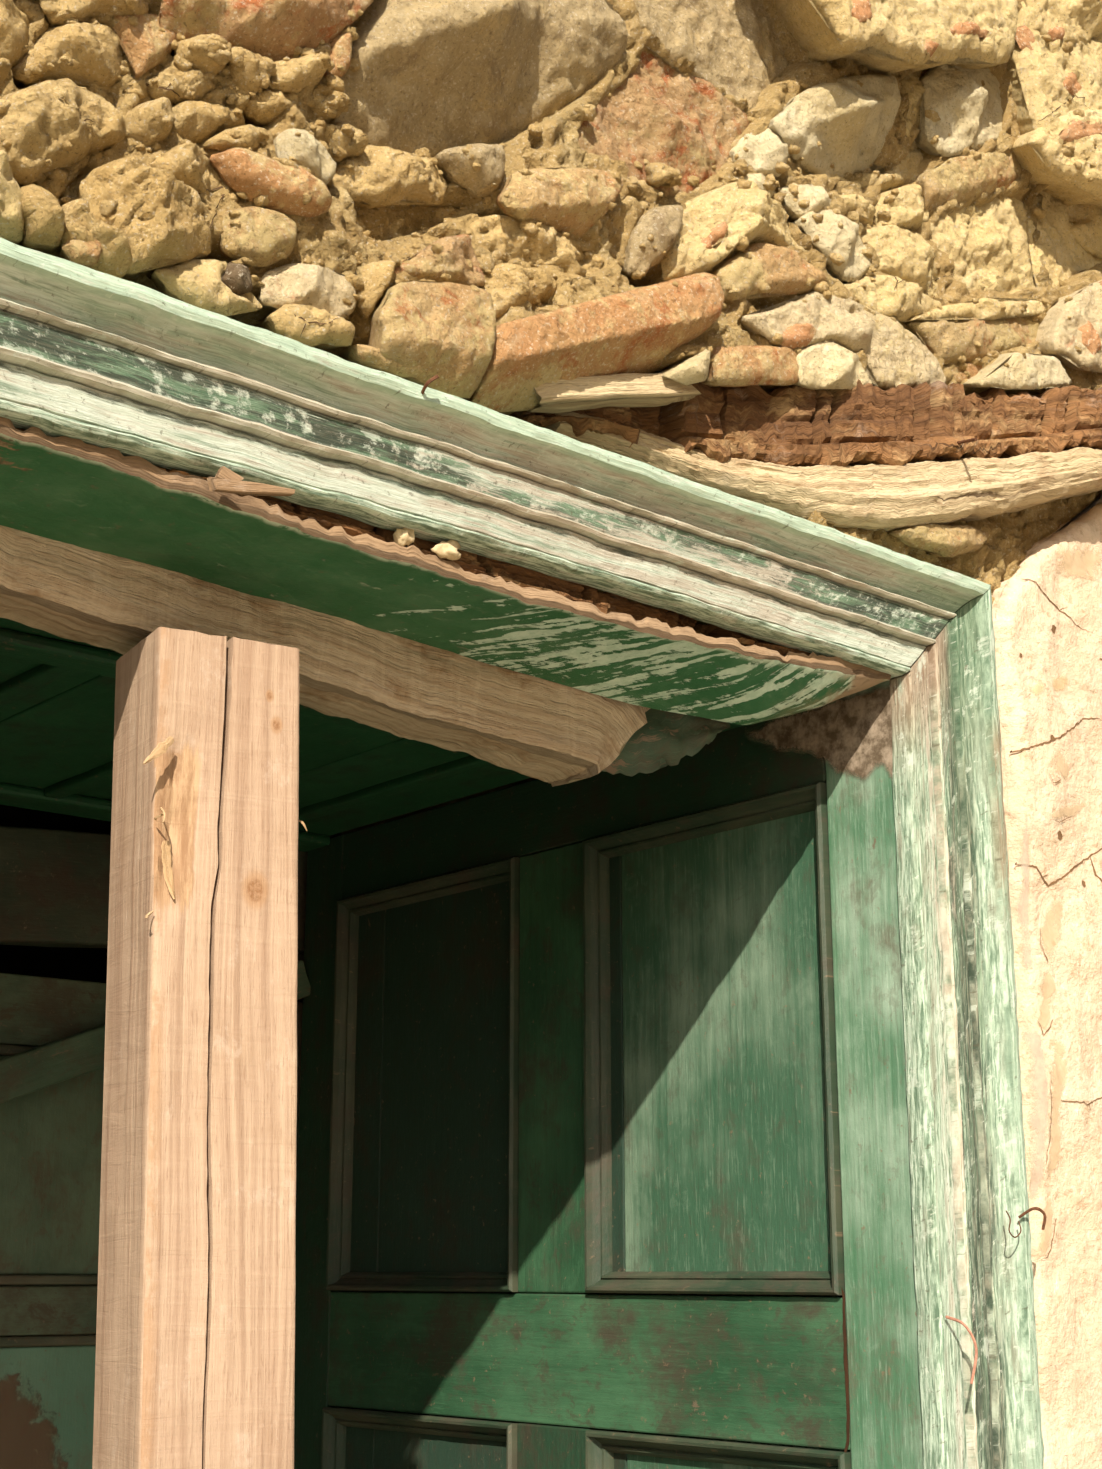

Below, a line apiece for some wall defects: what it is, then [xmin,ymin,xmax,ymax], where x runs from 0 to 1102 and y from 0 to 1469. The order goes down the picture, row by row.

crack [1023,579,1102,660]
crack [1010,718,1100,753]
crack [1015,848,1102,887]
peeling [0,1373,68,1469]